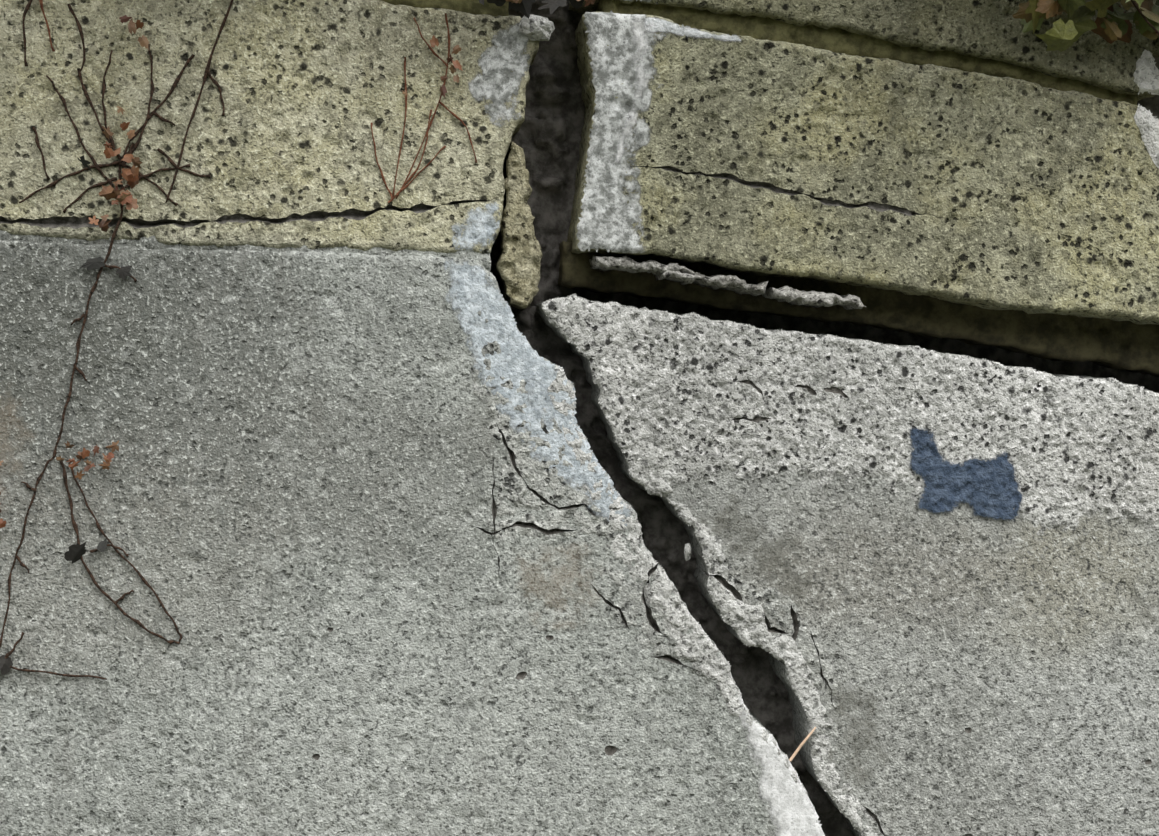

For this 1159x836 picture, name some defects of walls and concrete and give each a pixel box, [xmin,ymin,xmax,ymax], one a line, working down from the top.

crack [0,197,498,229]
crack [627,166,940,218]
crack [469,305,886,836]